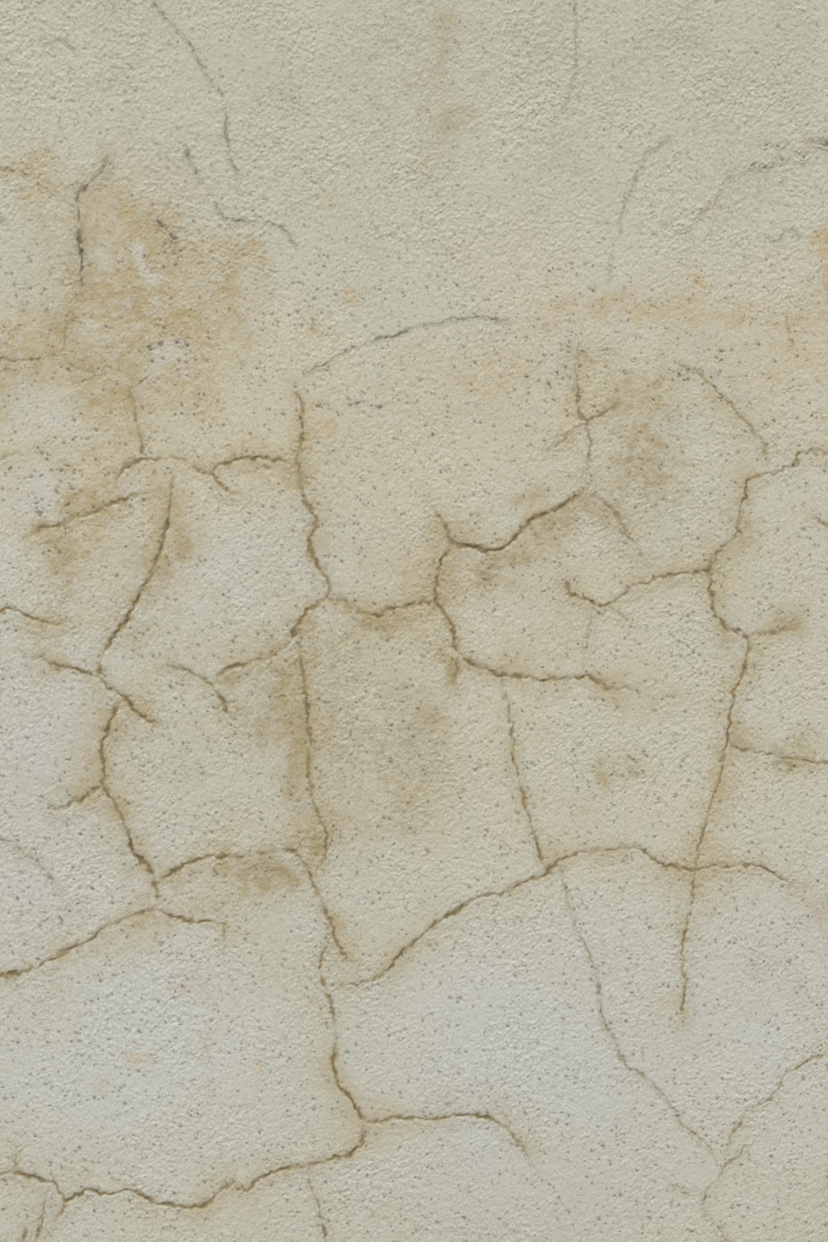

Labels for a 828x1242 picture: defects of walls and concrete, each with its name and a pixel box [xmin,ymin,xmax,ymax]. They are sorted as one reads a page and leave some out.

crack [0,145,115,382]
crack [39,36,78,56]
crack [149,0,298,248]
crack [562,0,579,113]
crack [607,133,674,284]
crack [674,136,828,234]
crack [764,226,802,242]
crack [0,314,828,1242]